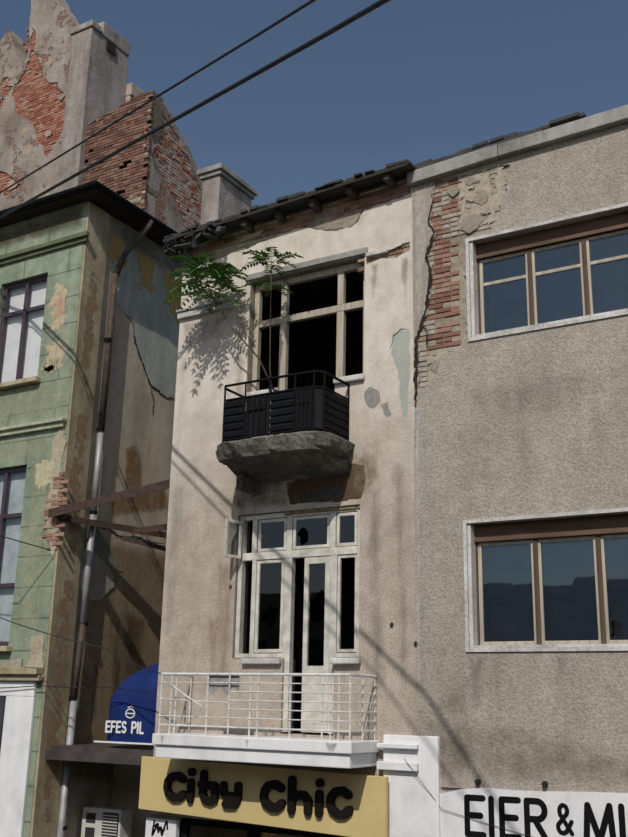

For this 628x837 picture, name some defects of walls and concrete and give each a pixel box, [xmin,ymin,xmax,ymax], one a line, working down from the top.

flaking render [0,28,66,161]
flaking render [0,171,21,196]
flaking render [143,116,202,229]
peeling [40,282,73,375]
peeling [81,271,98,389]
crack [124,313,175,416]
peeling [108,177,411,398]
peeling [364,387,392,417]
crack [390,189,435,453]
flaking render [391,169,509,416]
flaking render [32,413,123,572]
peeling [0,580,73,749]